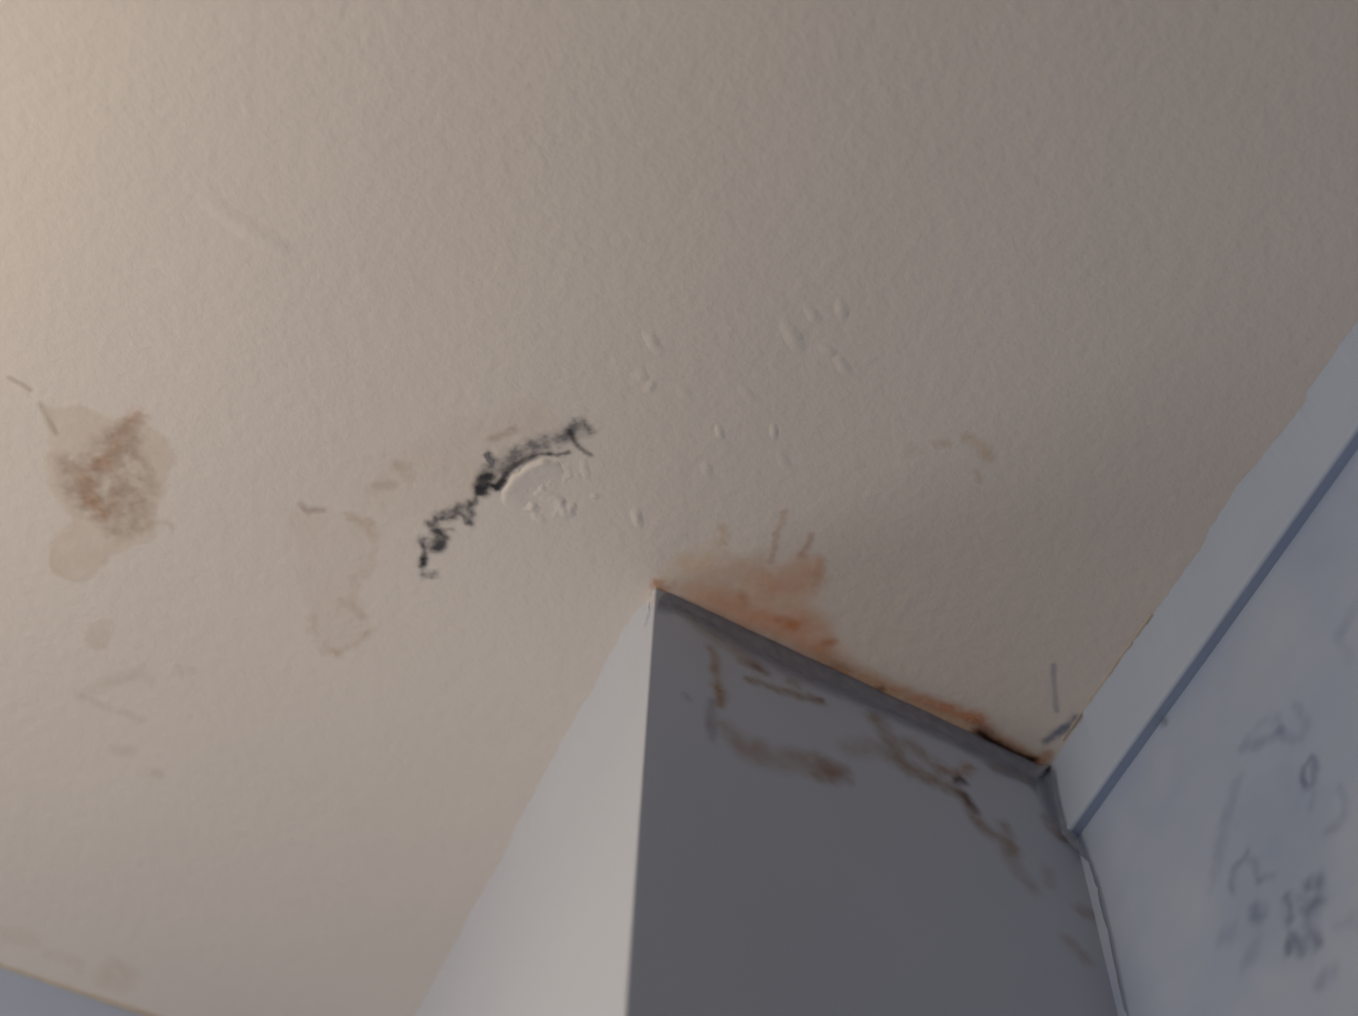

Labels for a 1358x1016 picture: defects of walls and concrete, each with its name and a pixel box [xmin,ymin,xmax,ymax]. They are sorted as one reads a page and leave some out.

crack [420,421,590,567]